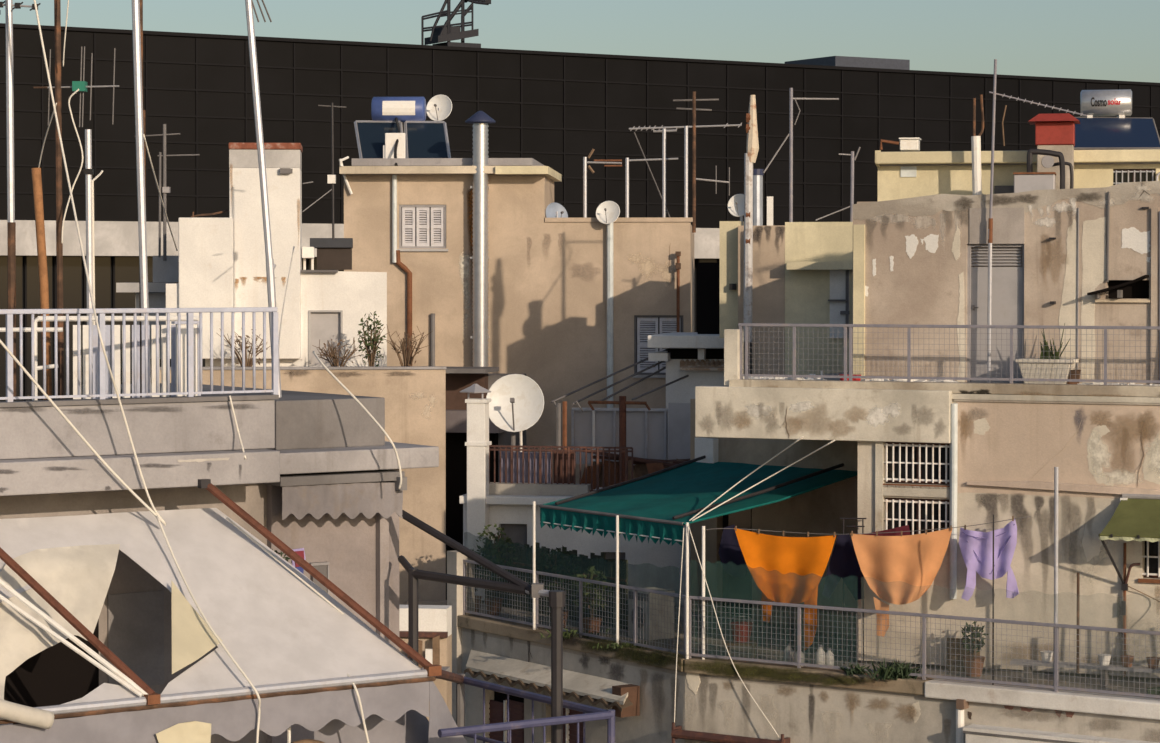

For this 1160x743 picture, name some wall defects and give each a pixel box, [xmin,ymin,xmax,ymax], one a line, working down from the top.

peeling [1121,227,1151,262]
peeling [865,225,966,382]
peeling [1059,217,1107,383]
peeling [1087,425,1115,486]
leakage [983,494,997,520]
leakage [1012,495,1054,533]